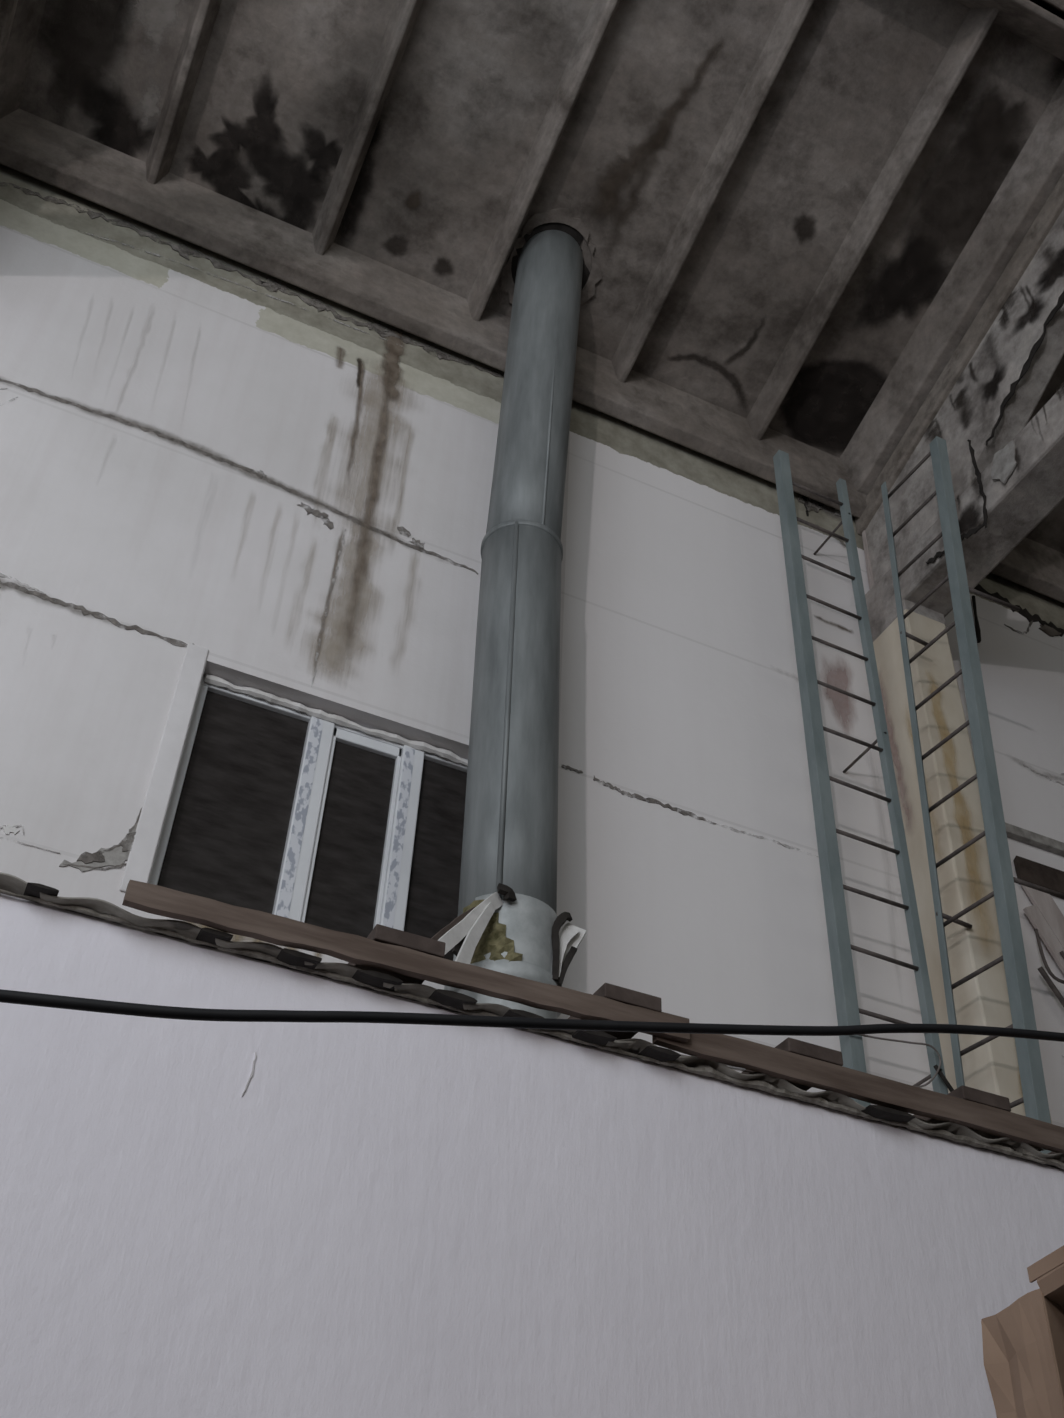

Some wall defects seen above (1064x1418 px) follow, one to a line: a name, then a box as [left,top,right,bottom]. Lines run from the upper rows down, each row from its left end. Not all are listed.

water stain [45,0,181,157]
water stain [190,83,341,230]
water stain [338,121,379,240]
crack [0,380,478,575]
water stain [782,361,887,452]
crack [926,291,1064,564]
crack [0,573,195,647]
crack [974,584,1064,637]
spalling [59,802,144,872]
crack [561,765,791,848]